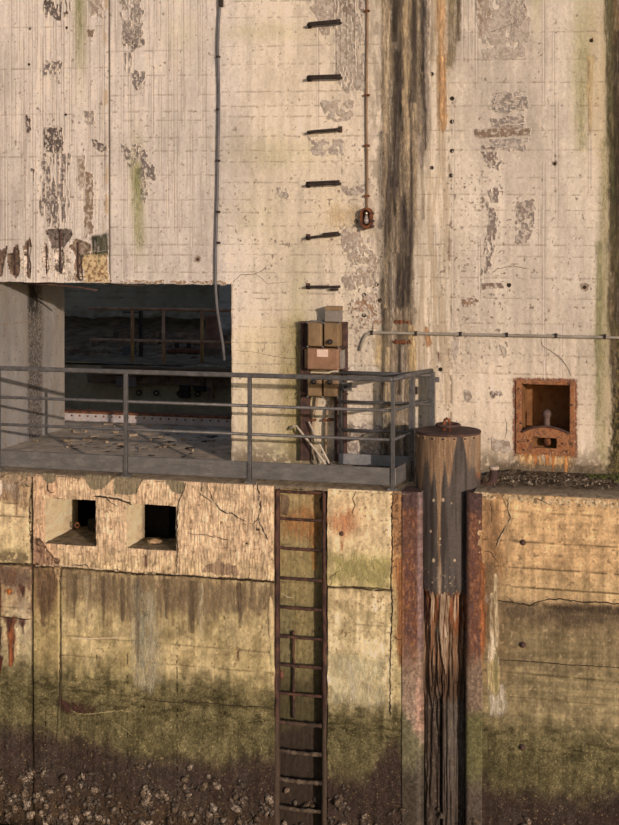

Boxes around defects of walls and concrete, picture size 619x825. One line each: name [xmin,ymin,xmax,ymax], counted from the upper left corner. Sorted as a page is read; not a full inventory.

peeling [119,0,146,91]
peeling [475,0,532,61]
peeling [474,90,532,171]
spalling [0,237,32,279]
peeling [30,126,227,286]
water stain [380,0,433,456]
water stain [496,0,619,475]
rust [512,377,578,472]
rust [0,585,25,672]
crack [0,482,271,739]
crack [328,491,401,717]
crack [495,596,619,606]